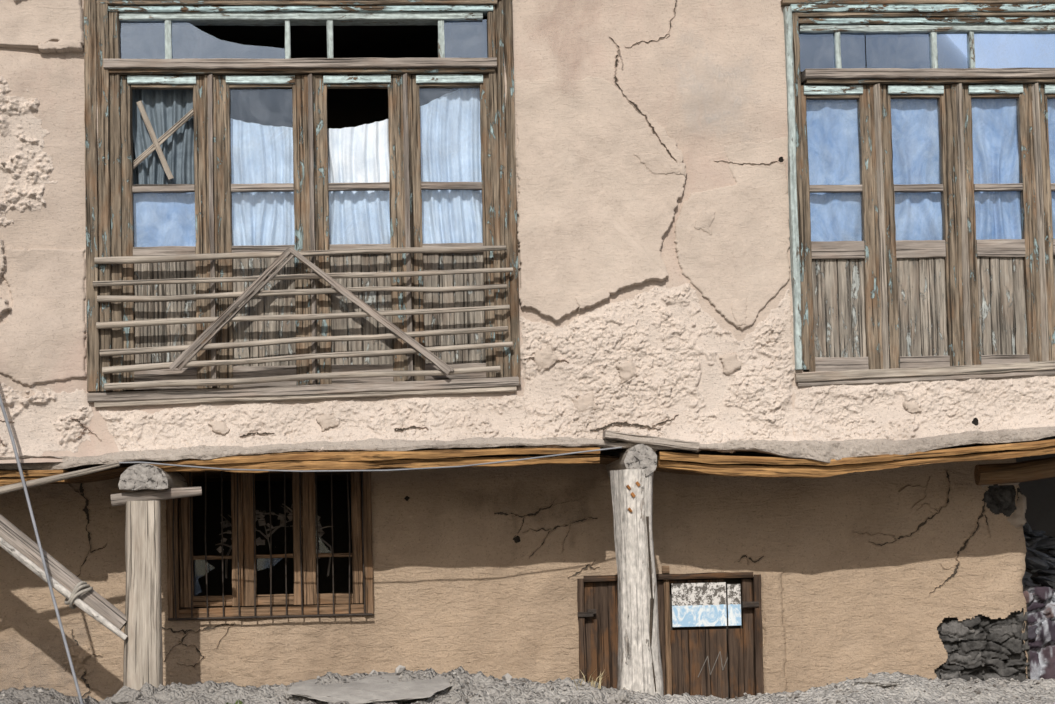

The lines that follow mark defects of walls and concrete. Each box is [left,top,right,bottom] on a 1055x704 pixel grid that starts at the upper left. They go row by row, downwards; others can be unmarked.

crack [609,0,678,162]
flaking render [0,76,1055,462]
crack [68,483,107,578]
crack [494,497,600,579]
crack [852,470,951,547]
crack [929,502,992,594]
spalling [981,482,1027,528]
crack [64,629,103,698]
crack [162,621,235,668]
spalling [934,603,1030,682]